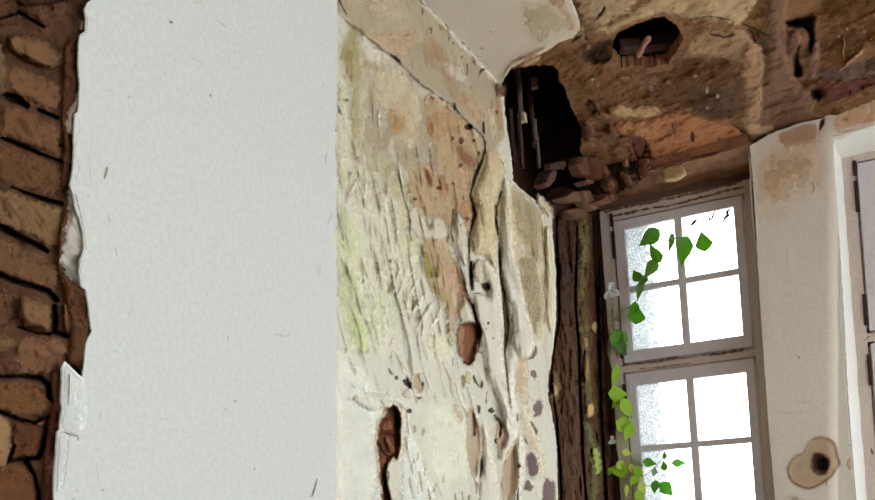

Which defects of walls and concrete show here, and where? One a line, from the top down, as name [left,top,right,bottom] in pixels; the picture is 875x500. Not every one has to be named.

flaking render [0,0,90,500]
crack [339,0,617,500]
flaking render [338,0,744,500]
spalling [577,0,818,161]
spalling [787,437,850,489]